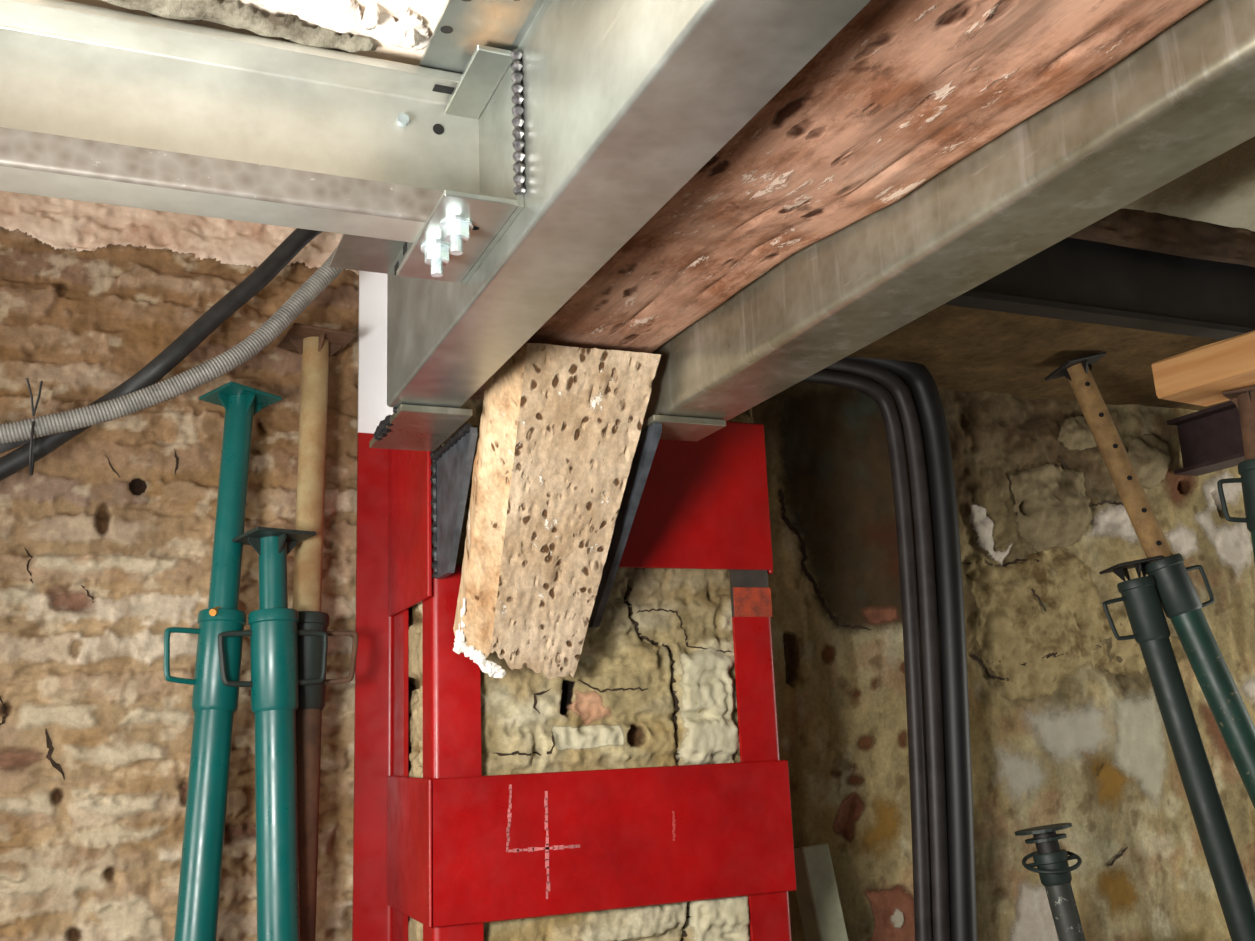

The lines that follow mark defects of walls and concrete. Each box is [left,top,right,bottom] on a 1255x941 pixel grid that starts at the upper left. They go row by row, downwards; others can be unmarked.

peeling [244,0,432,51]
peeling [0,191,297,267]
peeling [287,231,343,268]
crack [779,489,871,630]
flaking render [966,505,1146,701]
crack [578,584,730,763]
crack [45,729,65,779]
crack [493,689,555,756]
water stain [1000,753,1041,795]
water stain [1030,708,1129,802]
crack [681,901,691,941]
flaking render [865,885,915,941]